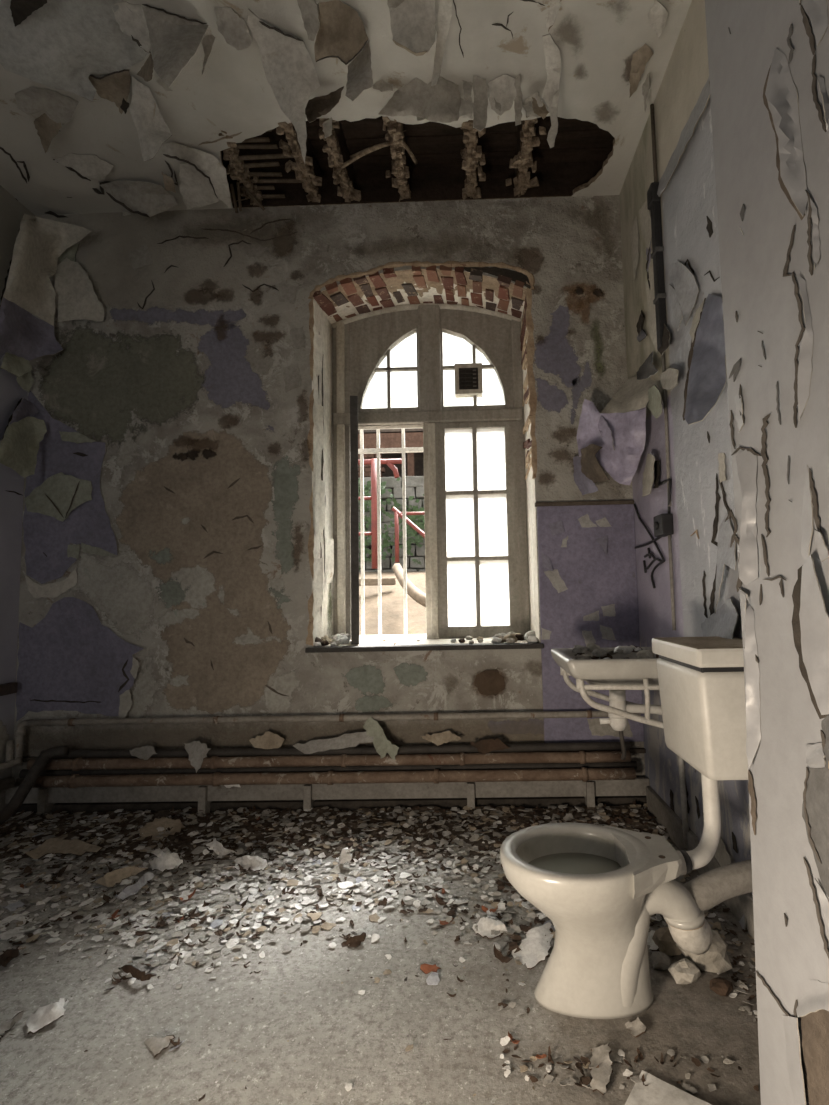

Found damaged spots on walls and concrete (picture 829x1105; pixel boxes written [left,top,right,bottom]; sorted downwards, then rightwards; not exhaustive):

peeling [0,0,561,218]
peeling [629,0,670,112]
peeling [0,211,105,377]
crack [137,219,297,309]
peeling [573,78,741,497]
crack [805,190,821,276]
damp [172,435,217,461]
damp [218,415,239,428]
flaking render [115,429,291,714]
peeling [691,413,771,835]
peeling [789,465,829,959]
peeling [783,980,829,1105]